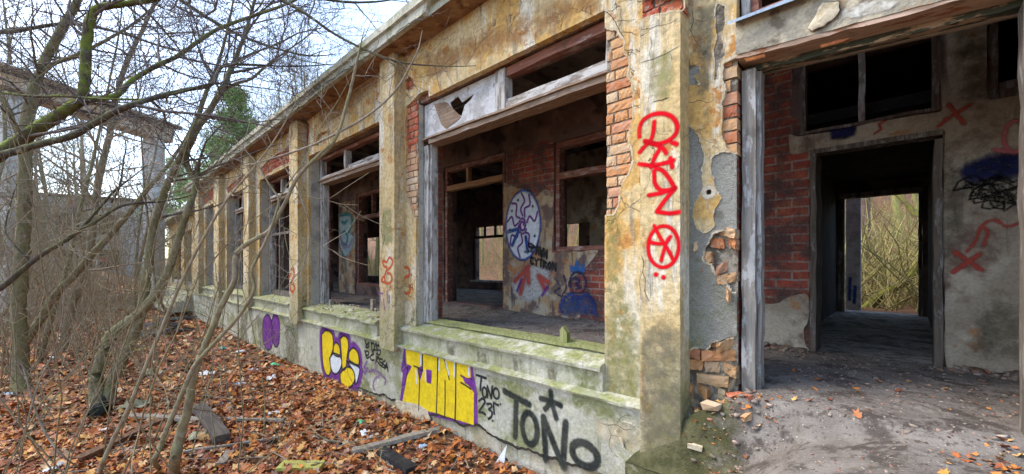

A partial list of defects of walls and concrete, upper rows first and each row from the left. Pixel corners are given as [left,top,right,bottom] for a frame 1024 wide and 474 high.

flaking render [404,75,429,221]
flaking render [605,27,634,216]
peeling [689,1,742,416]
damp [642,330,680,450]